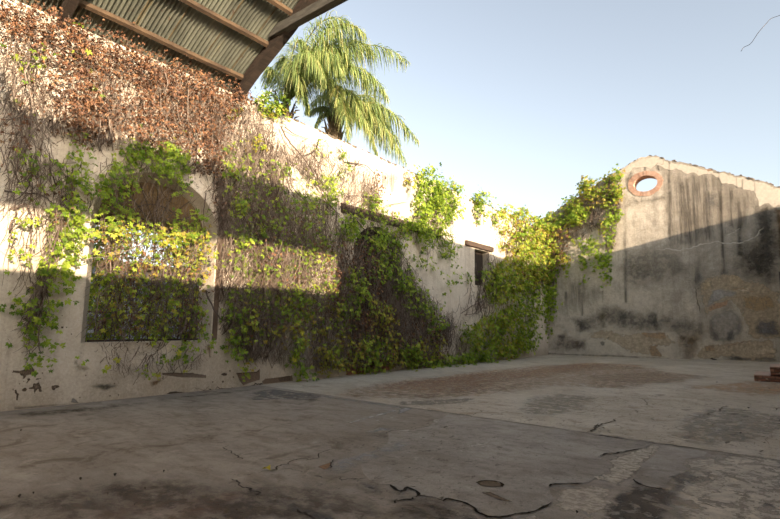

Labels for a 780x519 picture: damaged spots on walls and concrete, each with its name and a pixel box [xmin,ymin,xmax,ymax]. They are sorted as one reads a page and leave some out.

damp [679,183,722,237]
damp [738,199,777,279]
damp [579,309,697,349]
flaking render [12,368,59,400]
crack [232,449,363,495]
crack [387,480,580,518]
spalling [477,481,512,502]
peeling [555,446,659,517]
peeling [673,450,780,519]